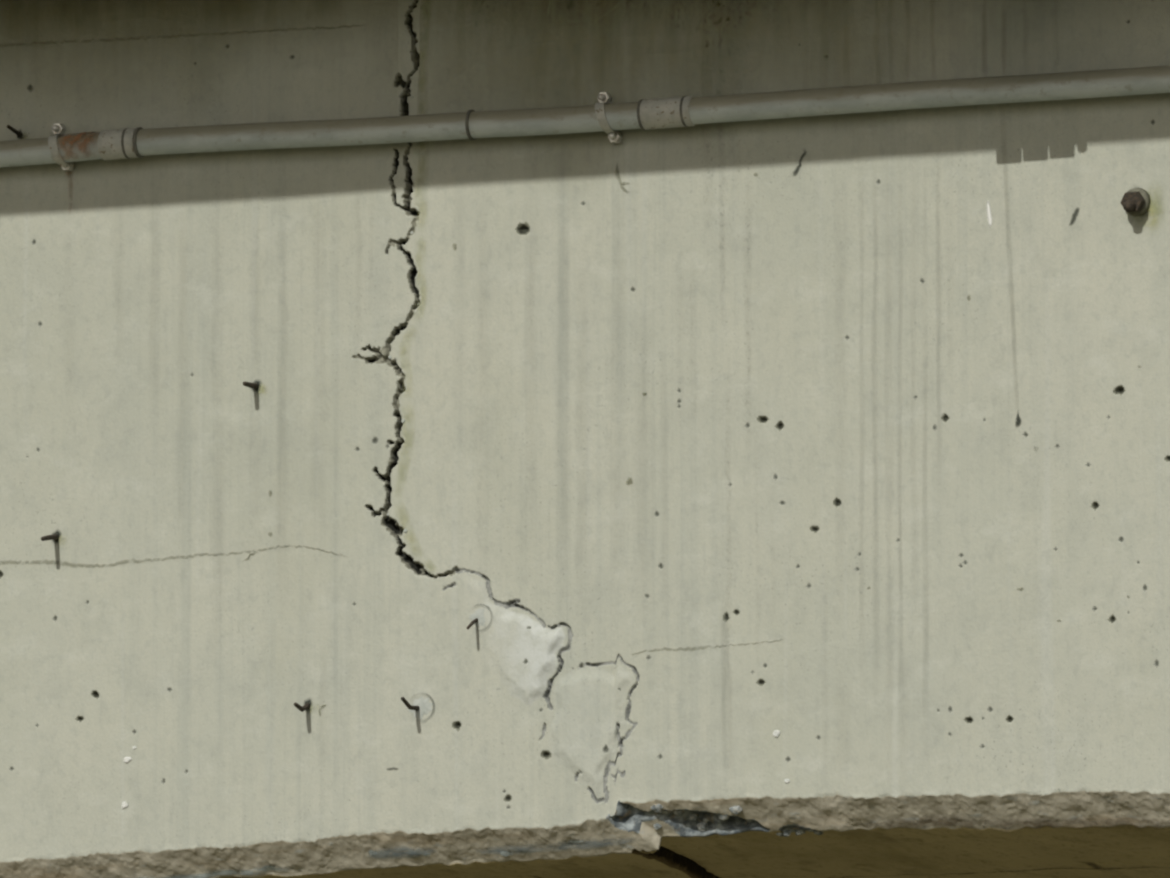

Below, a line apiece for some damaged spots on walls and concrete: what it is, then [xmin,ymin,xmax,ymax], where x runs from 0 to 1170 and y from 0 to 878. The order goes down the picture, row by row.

crack [353,0,639,804]
spalling [488,801,824,856]